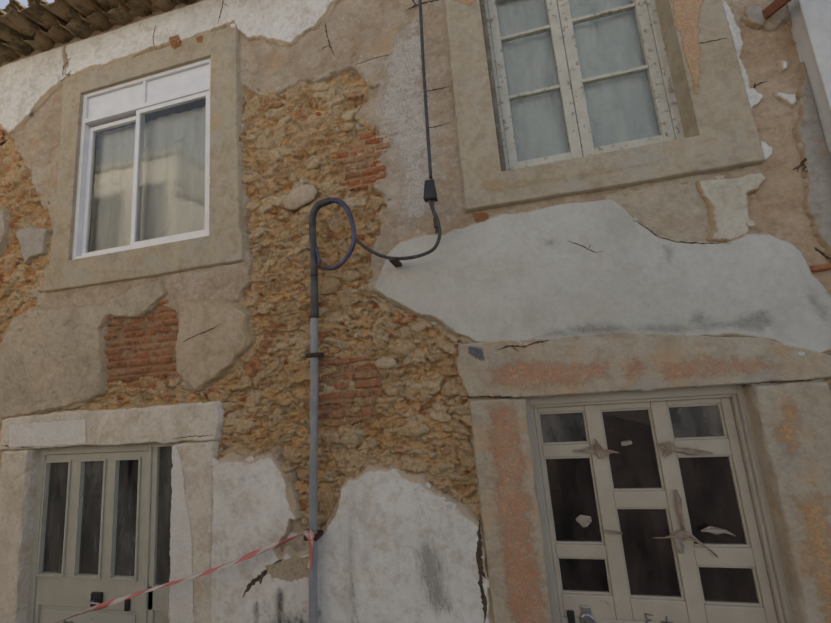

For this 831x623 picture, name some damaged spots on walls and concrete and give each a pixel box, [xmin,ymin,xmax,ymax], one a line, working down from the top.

peeling [0,0,344,345]
spalling [695,0,831,296]
crack [792,158,808,172]
spalling [0,60,495,623]
crack [496,339,552,352]
crack [476,520,487,622]